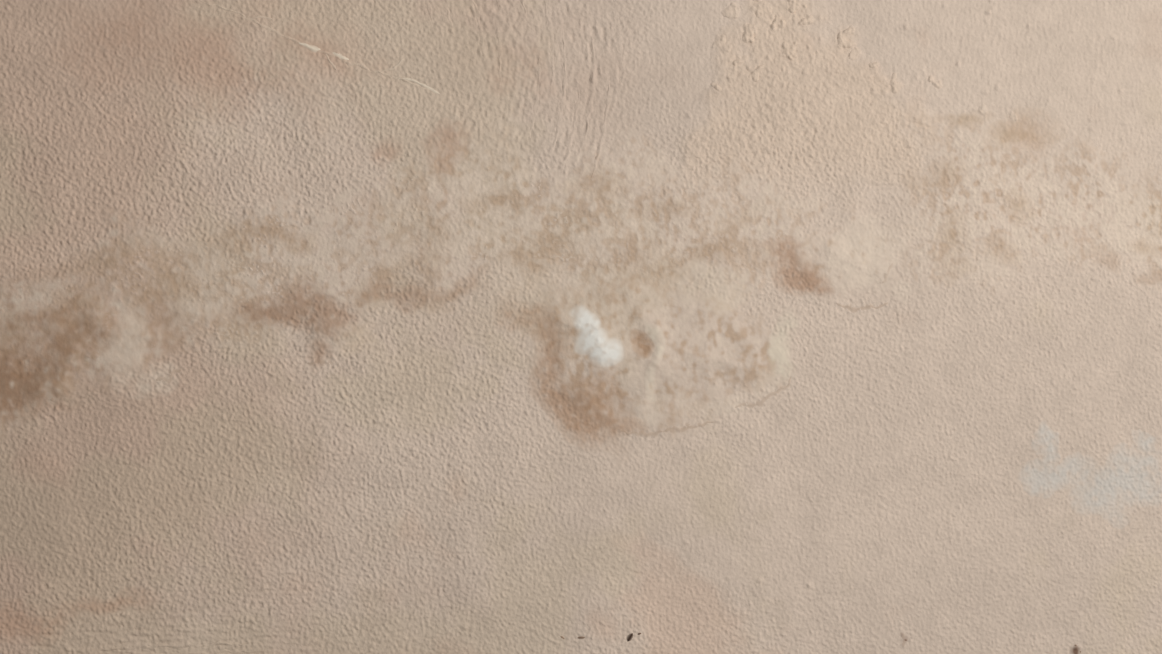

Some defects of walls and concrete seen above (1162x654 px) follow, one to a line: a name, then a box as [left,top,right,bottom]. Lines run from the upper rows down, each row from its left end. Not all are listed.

leakage [0,36,836,468]
leakage [886,101,1162,299]